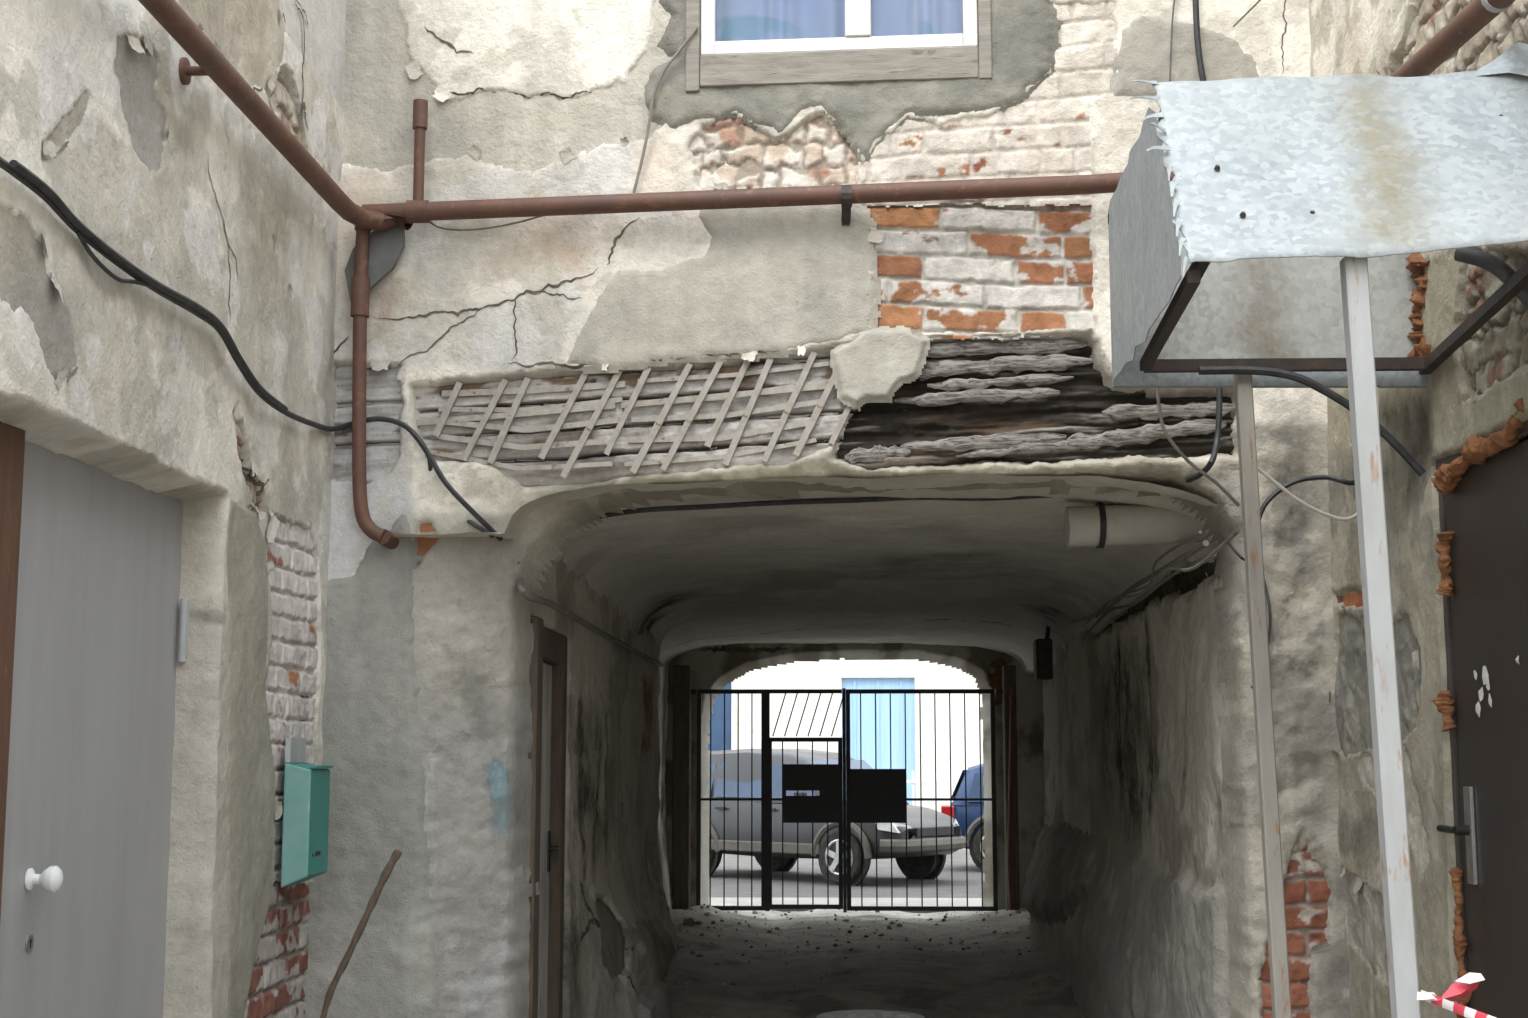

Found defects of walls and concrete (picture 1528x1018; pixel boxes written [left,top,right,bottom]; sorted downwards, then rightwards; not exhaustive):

peeling [114,34,169,173]
peeling [178,0,306,144]
crack [424,26,592,100]
flaking render [690,1,1115,190]
peeling [0,207,79,389]
crack [334,217,640,369]
crack [651,350,779,362]
flaking render [830,194,1094,411]
flaking render [233,400,318,1018]
water stain [578,709,607,857]
flaking render [1259,942,1273,1018]
flaking render [1284,832,1389,1018]